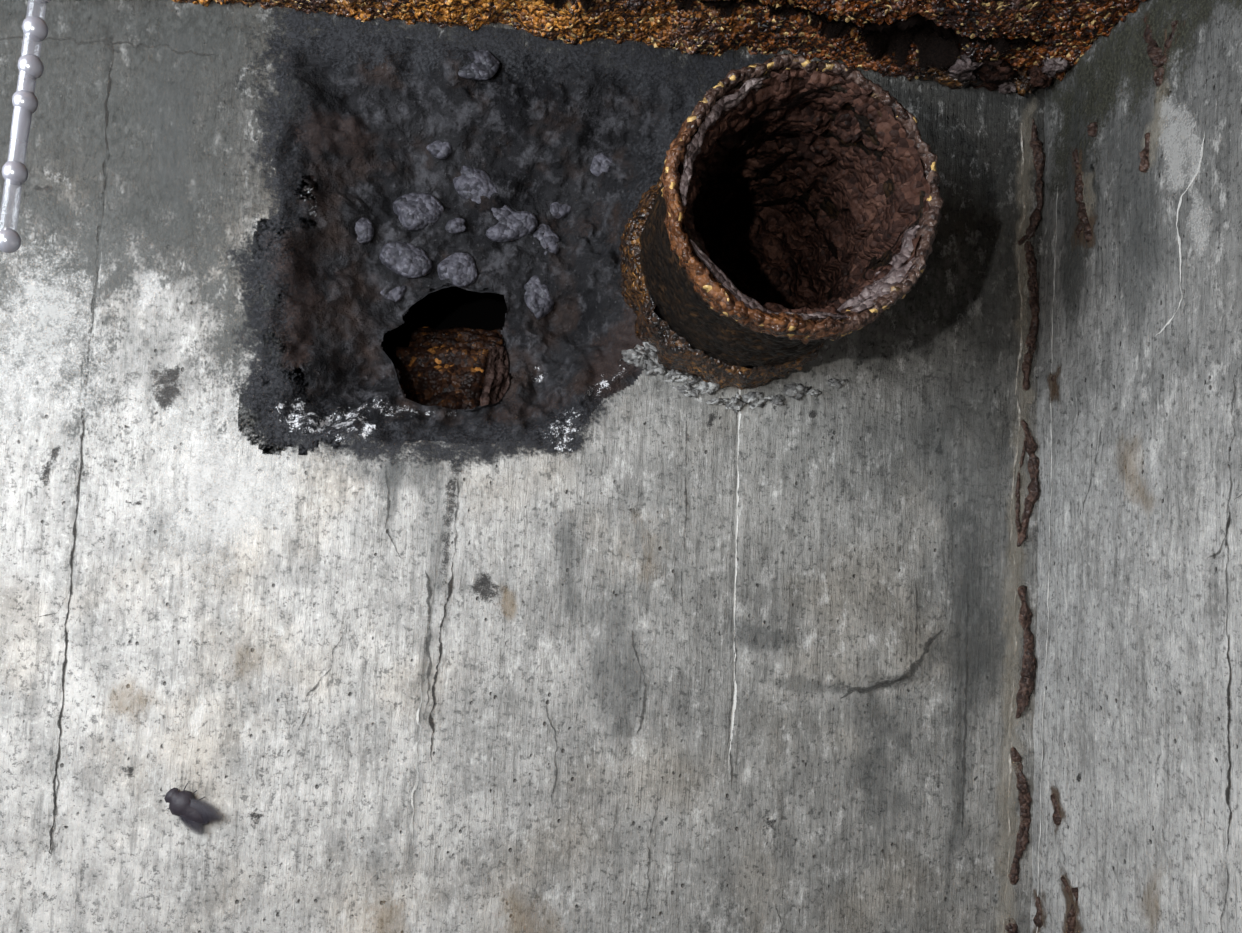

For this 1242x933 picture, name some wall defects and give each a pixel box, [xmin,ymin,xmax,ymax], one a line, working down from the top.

rust [911,54,1070,97]
spalling [267,33,848,451]
rust [679,67,931,323]
rust [1139,132,1152,173]
crack [1,25,218,854]
rust [1014,419,1040,547]
rust [1015,585,1036,719]
rust [1009,746,1032,885]
rust [1051,786,1066,832]
rust [1004,918,1018,933]
rust [1033,889,1046,933]
rust [1061,872,1082,933]